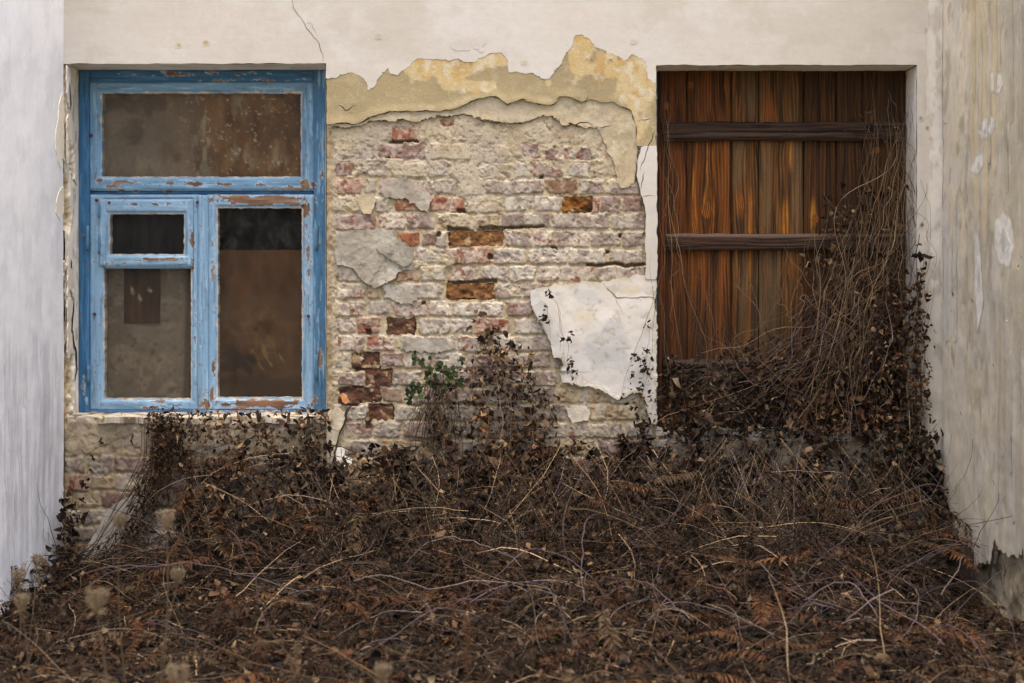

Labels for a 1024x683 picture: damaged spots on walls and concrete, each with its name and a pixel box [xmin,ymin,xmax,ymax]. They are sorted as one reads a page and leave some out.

crack [292,2,323,54]
flaking render [55,35,916,563]
flaking render [974,549,1024,629]